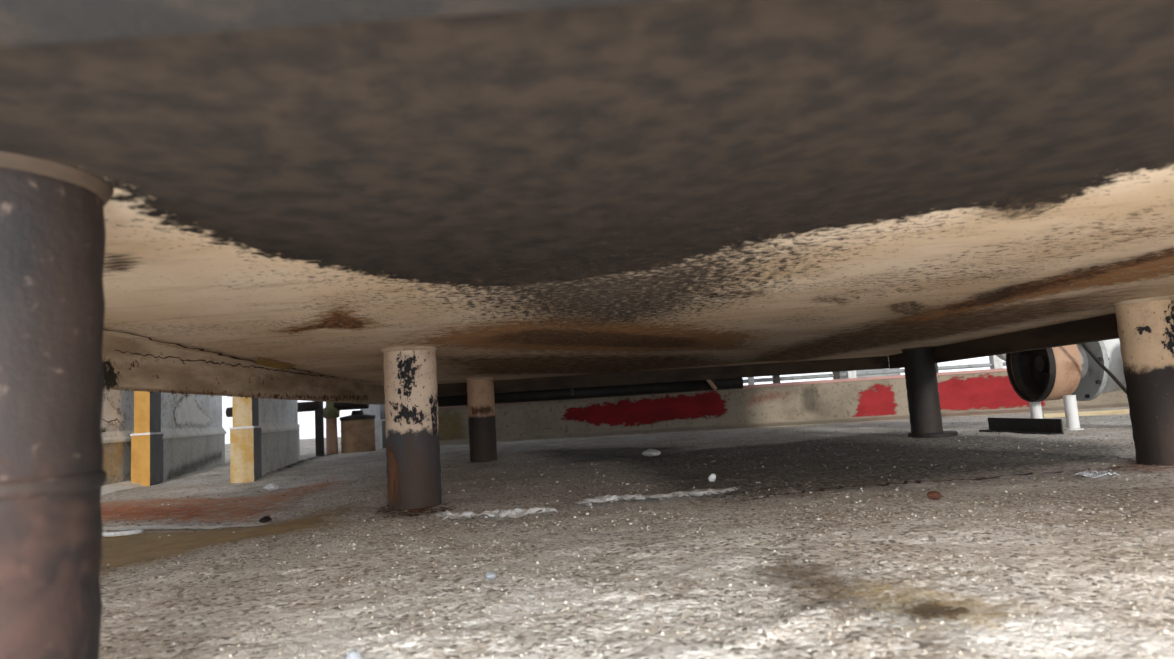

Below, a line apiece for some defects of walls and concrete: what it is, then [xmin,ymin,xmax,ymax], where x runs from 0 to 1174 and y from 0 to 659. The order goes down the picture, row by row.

leakage [0,0,1174,333]
corrosion [270,308,372,334]
corrosion [900,248,1174,324]
peeling [1136,300,1174,357]
peeling [389,350,438,438]
corrosion [369,443,456,518]